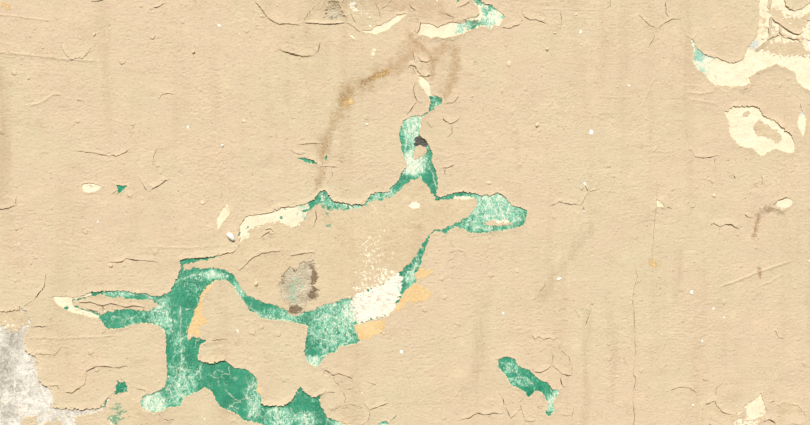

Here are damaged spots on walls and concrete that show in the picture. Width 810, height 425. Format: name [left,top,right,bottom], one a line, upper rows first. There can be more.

peeling [347,0,509,57]
peeling [687,0,810,161]
peeling [0,72,532,425]
peeling [494,353,565,420]
peeling [692,390,769,425]